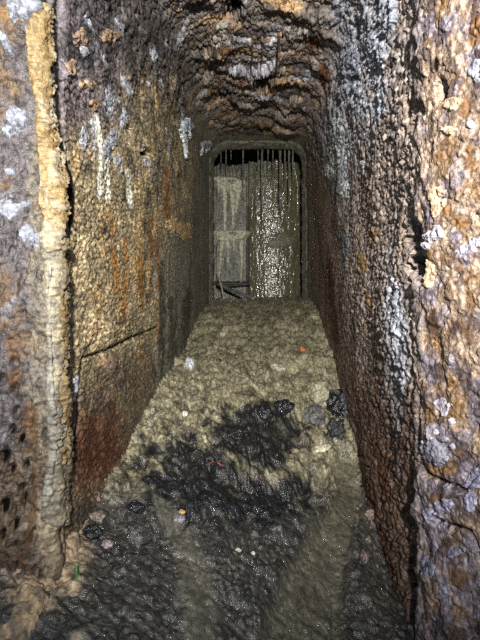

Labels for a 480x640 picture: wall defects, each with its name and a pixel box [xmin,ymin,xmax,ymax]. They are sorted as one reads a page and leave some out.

crack [52,0,74,232]
leakage [94,113,111,203]
leakage [125,168,133,209]
corrosion [111,238,129,316]
crack [72,326,156,463]